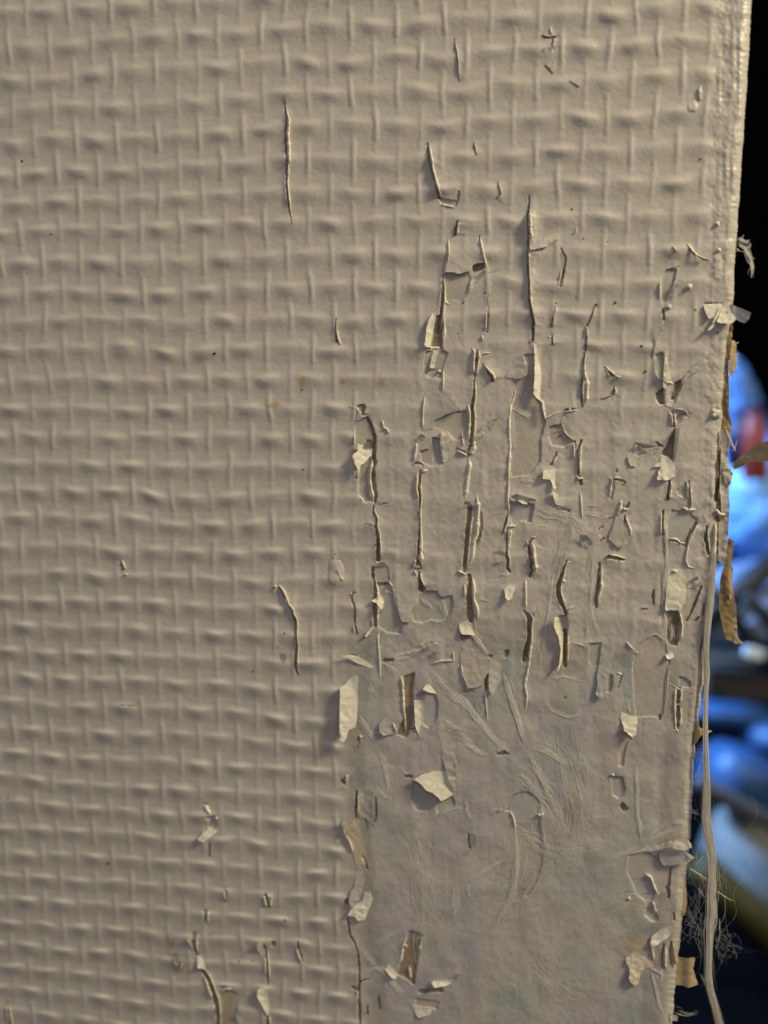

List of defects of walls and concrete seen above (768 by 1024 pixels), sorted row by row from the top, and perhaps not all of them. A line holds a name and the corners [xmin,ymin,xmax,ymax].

crack [284,95,293,224]
crack [426,143,460,236]
peeling [423,316,448,379]
peeling [652,320,712,407]
peeling [350,404,389,504]
peeling [506,355,574,506]
peeling [653,457,676,480]
crack [274,584,299,674]
peeling [339,676,358,742]
peeling [379,673,438,742]
peeling [588,633,670,812]
peeling [386,931,459,1018]